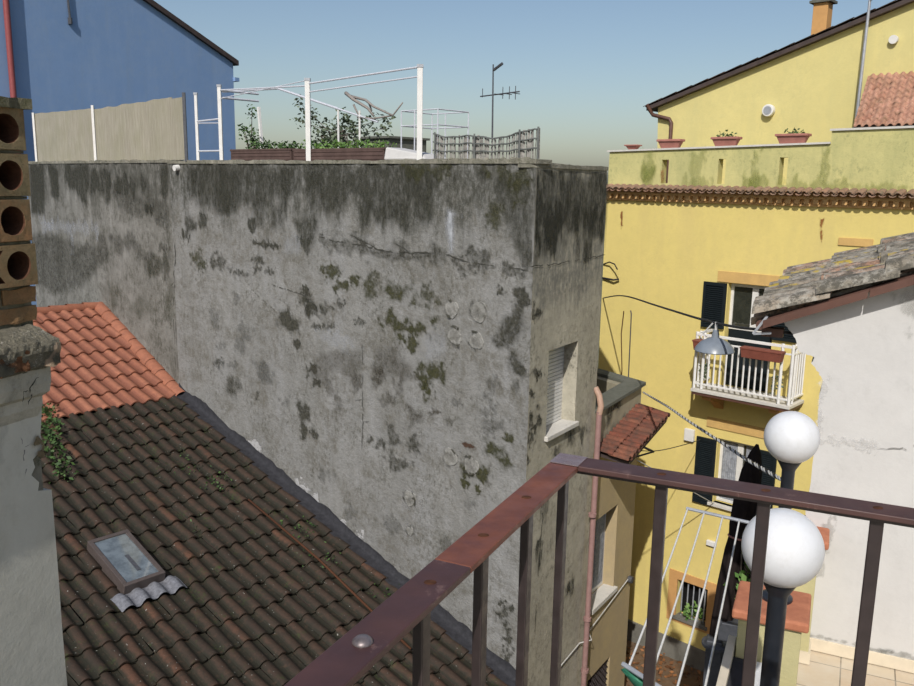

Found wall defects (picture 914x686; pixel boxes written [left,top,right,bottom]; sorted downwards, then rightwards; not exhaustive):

leakage [30,164,168,227]
leakage [182,165,294,276]
leakage [296,164,490,275]
leakage [502,170,608,276]
crack [322,236,604,270]
leakage [279,308,301,349]
leakage [299,284,346,330]
leakage [306,354,360,387]
leakage [494,287,542,465]
leakage [297,402,318,440]
leakage [367,425,421,471]